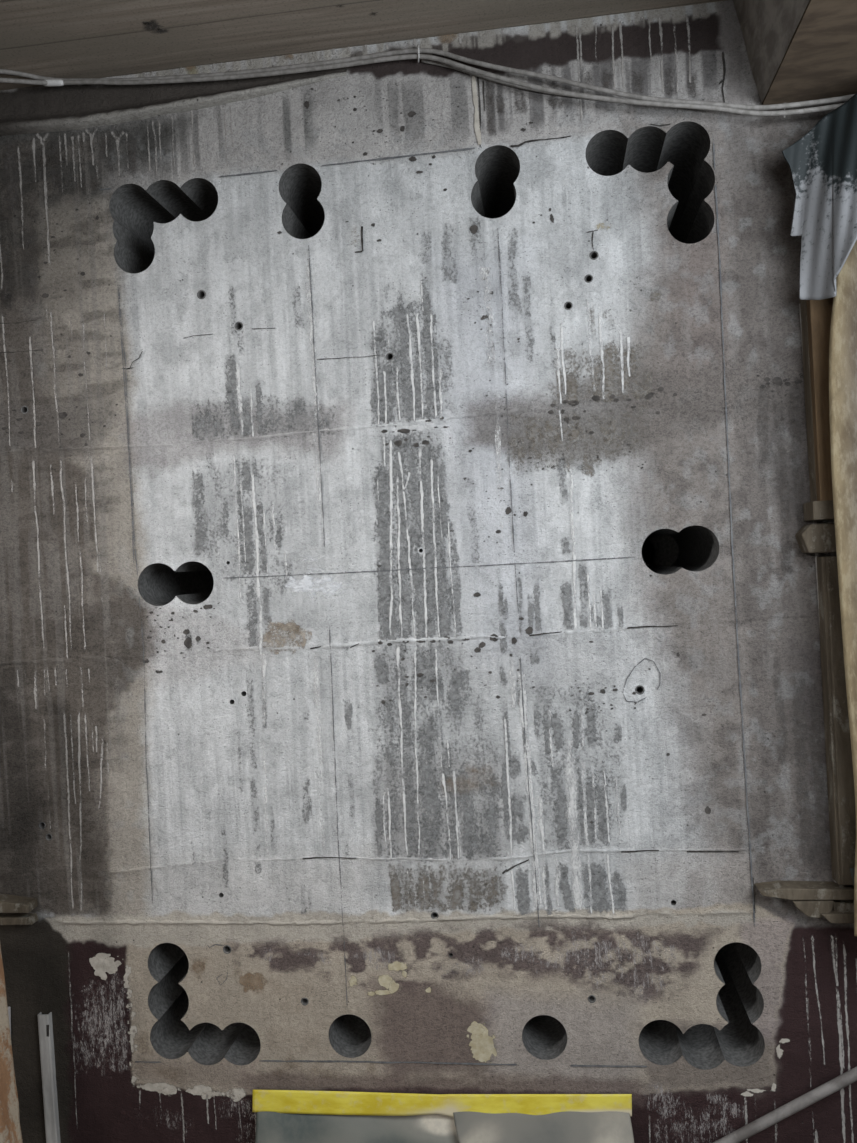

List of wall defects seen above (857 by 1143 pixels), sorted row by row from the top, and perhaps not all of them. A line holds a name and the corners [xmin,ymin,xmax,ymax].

water stain [4,117,175,301]
water stain [192,267,335,441]
water stain [29,337,40,574]
water stain [495,301,652,630]
water stain [34,459,101,709]
water stain [371,280,627,915]
water stain [63,669,109,910]
peeling [89,953,246,1102]
peeling [348,961,407,996]
spalling [466,1021,497,1063]
water stain [831,936,857,1074]
water stain [840,1085,854,1143]